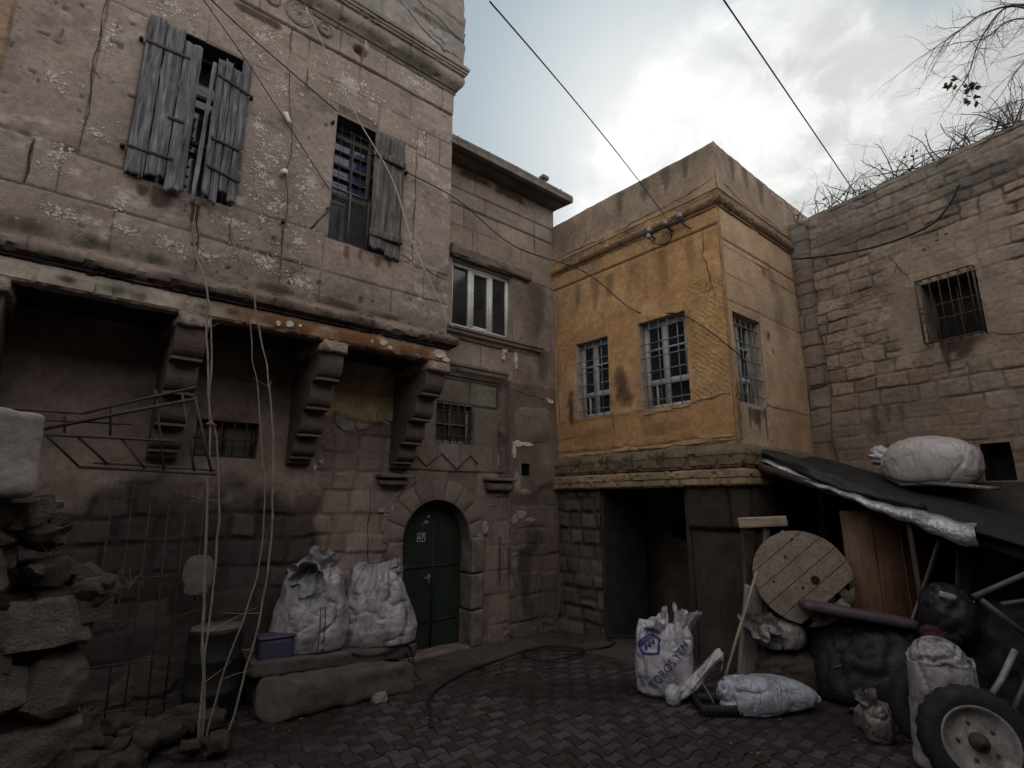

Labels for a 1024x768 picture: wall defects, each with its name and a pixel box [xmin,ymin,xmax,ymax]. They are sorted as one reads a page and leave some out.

water stain [138,184,174,207]
crack [697,238,715,306]
water stain [616,372,631,405]
peeling [512,440,534,496]